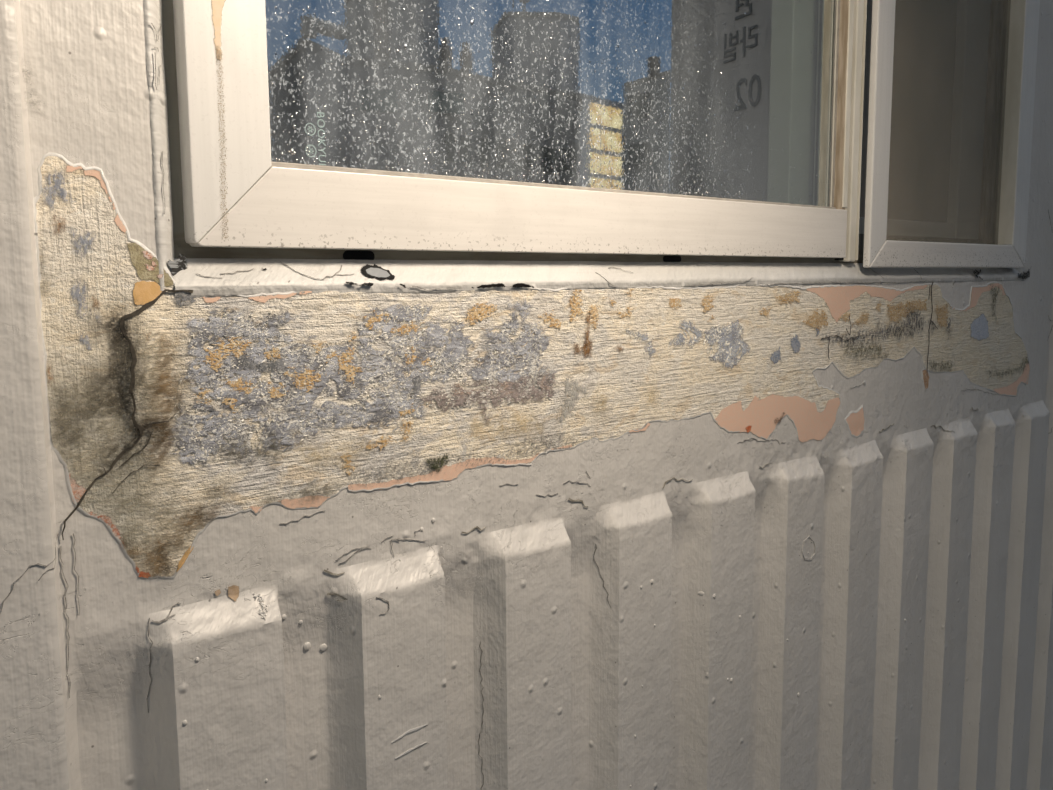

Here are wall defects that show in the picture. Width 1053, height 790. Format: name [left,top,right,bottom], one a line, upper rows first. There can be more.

crack [0,268,254,713]
water stain [53,319,215,577]
crack [280,261,355,280]
peeling [33,153,1030,580]
crack [687,268,938,371]
water stain [826,310,934,357]